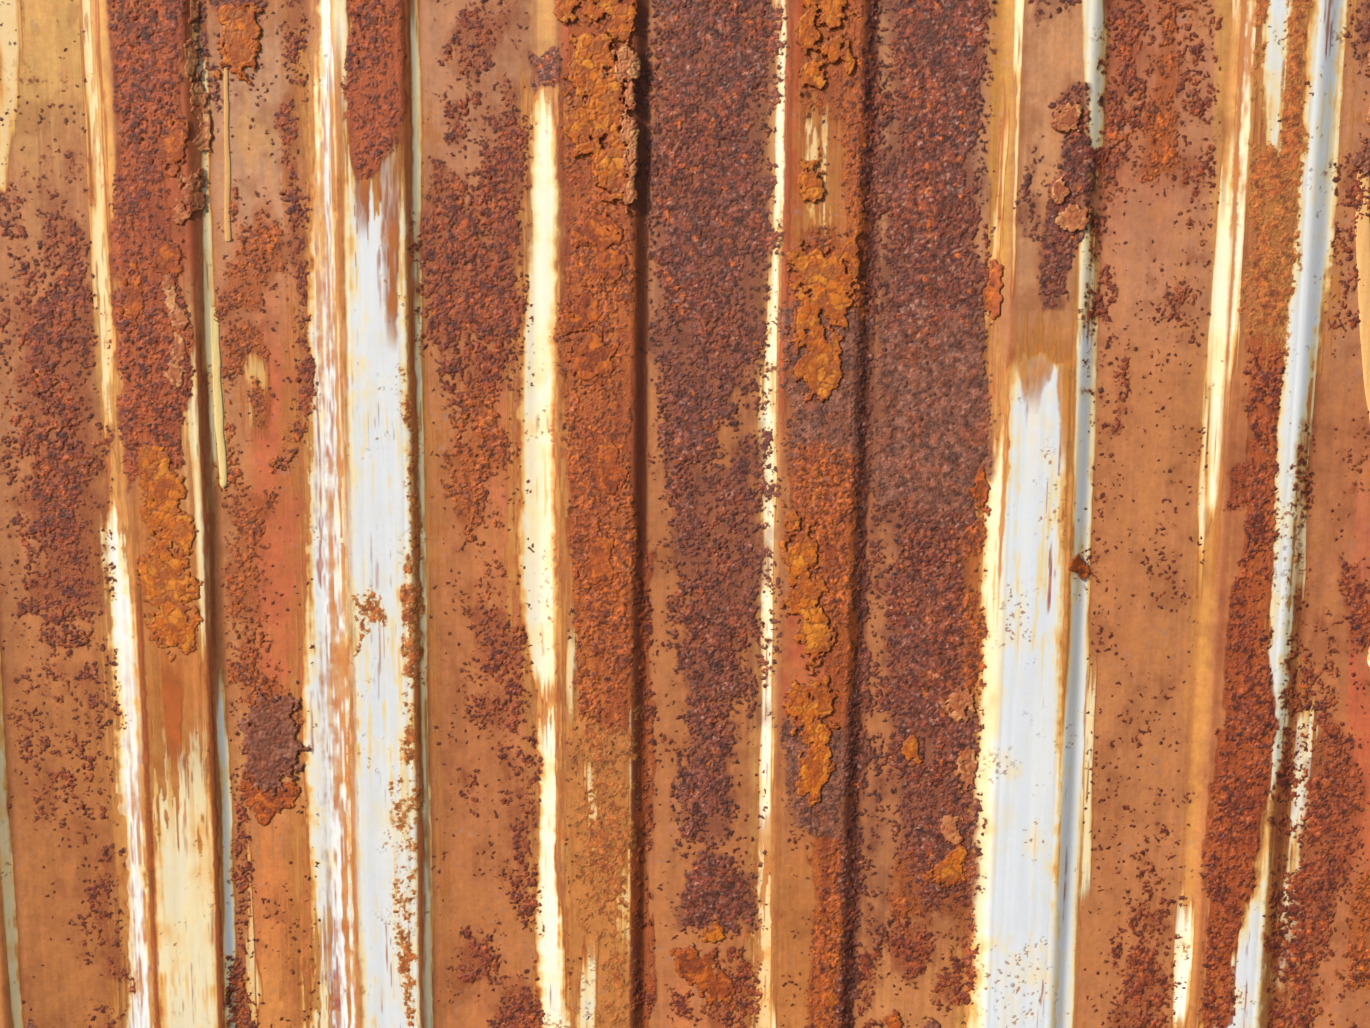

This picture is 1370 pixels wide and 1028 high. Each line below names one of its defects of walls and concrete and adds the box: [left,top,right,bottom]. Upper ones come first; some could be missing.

rust [0,0,348,1028]
rust [335,0,1370,1028]